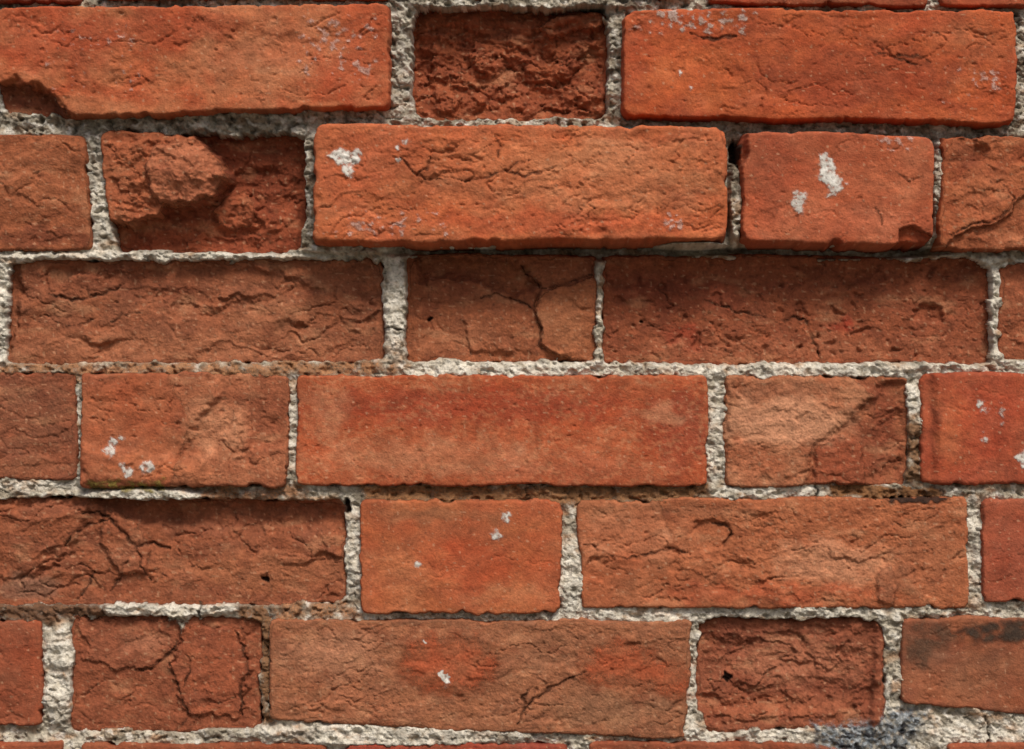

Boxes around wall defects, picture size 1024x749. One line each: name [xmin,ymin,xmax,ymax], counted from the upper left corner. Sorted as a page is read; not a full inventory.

spalling [0,84,70,119]
spalling [413,9,607,121]
crack [480,266,578,345]
spalling [0,130,384,606]
spalling [71,137,1024,738]
crack [65,511,170,580]
crack [138,601,202,725]
crack [239,645,249,715]
crack [520,672,585,717]